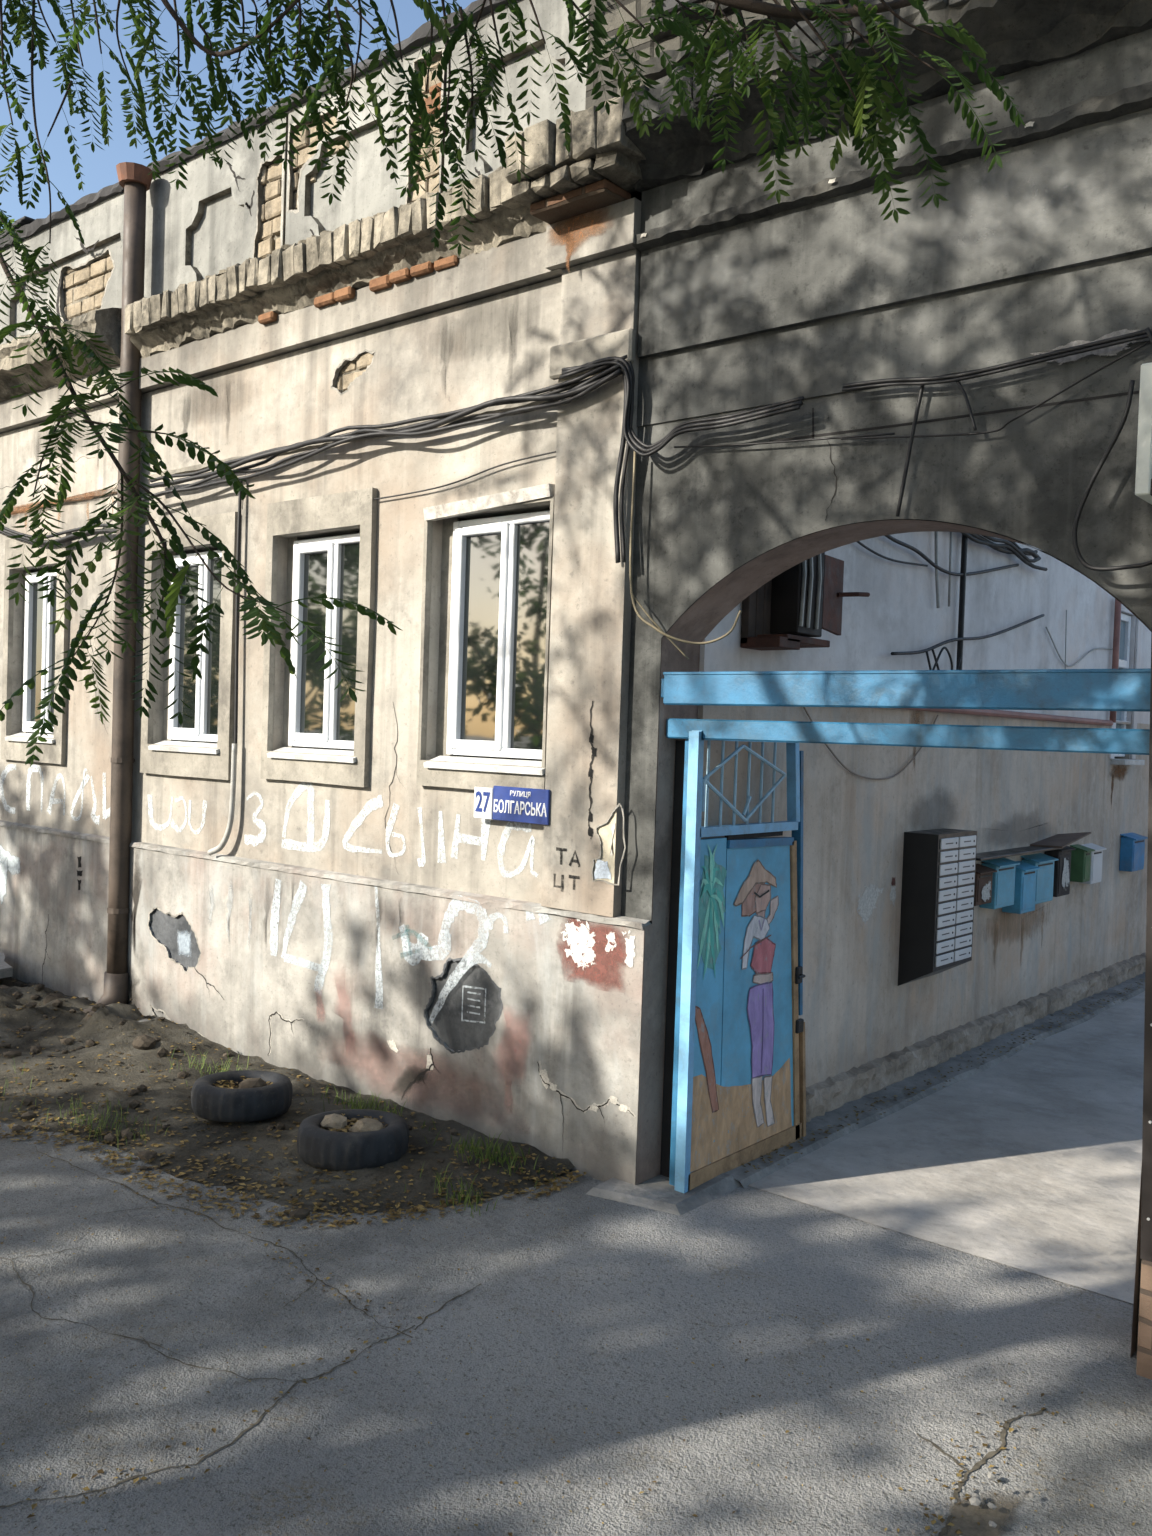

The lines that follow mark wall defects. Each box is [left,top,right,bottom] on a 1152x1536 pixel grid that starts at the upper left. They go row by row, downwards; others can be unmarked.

flaking render [56,248,115,323]
flaking render [252,105,350,259]
flaking render [405,47,445,205]
corrosion [552,210,604,267]
crack [588,701,597,839]
flaking render [591,803,626,885]
flaking render [147,906,201,974]
peeling [560,918,636,987]
flaking render [424,957,503,1070]
crack [537,1061,636,1159]
crack [0,1147,481,1507]
crack [939,1407,1047,1536]